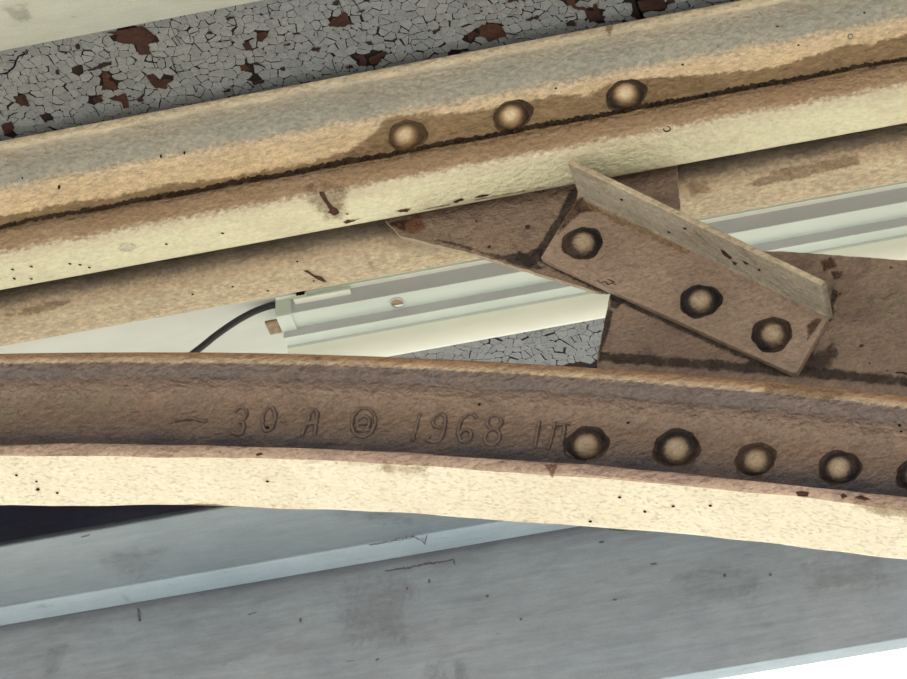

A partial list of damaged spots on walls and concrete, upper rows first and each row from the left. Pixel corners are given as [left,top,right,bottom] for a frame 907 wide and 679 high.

peeling [328,0,370,27]
peeling [566,0,605,23]
peeling [638,0,675,12]
peeling [103,26,154,55]
peeling [242,32,268,51]
peeling [468,23,506,42]
peeling [345,41,387,69]
peeling [83,61,144,108]
peeling [146,74,172,89]
peeling [13,95,30,106]
peeling [1,121,14,134]